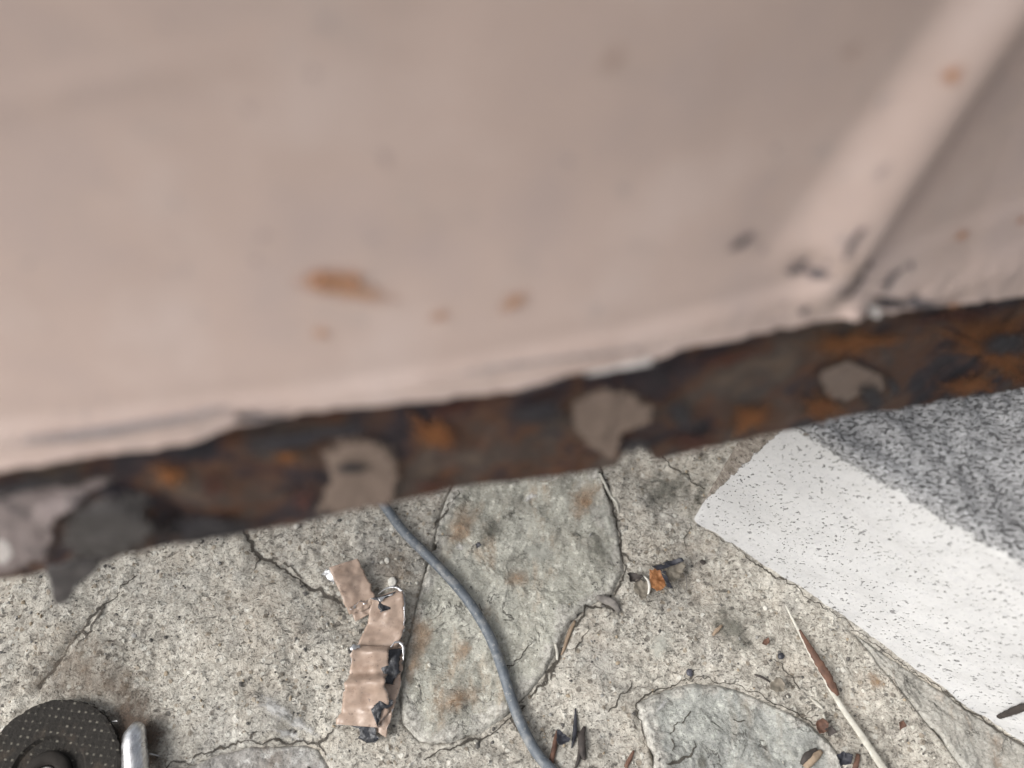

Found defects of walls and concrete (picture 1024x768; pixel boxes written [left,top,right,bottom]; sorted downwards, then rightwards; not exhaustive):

rust [312,272,379,298]
peeling [787,260,829,279]
peeling [866,269,957,318]
rust [412,403,472,450]
rust [676,436,712,450]
crack [243,533,346,608]
crack [424,469,634,760]